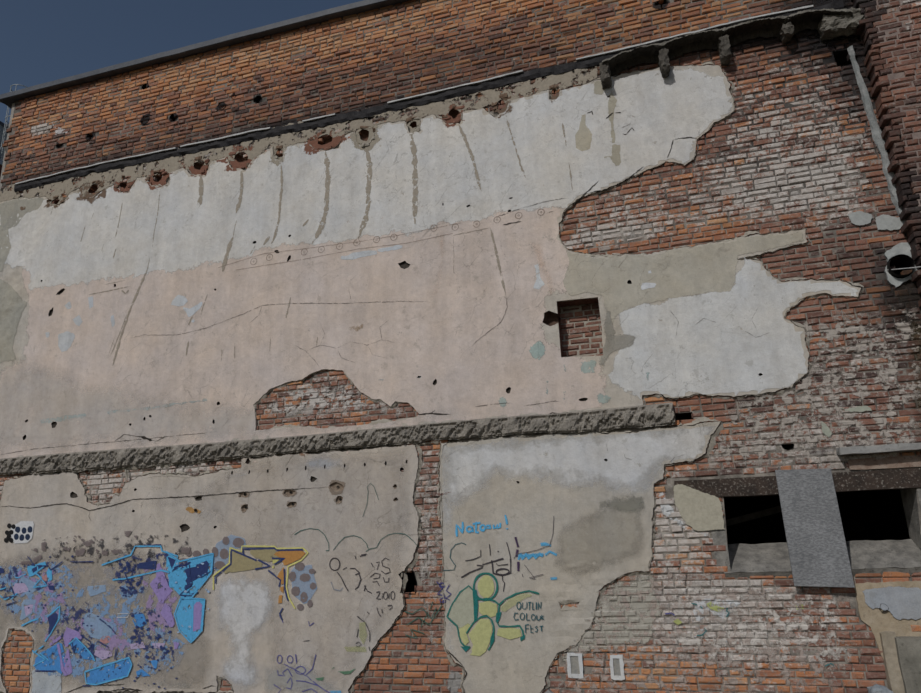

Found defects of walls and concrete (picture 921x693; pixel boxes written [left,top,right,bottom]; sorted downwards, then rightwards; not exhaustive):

damp [269,147,287,242]
flaking render [0,40,653,363]
damp [303,123,380,244]
damp [406,119,421,224]
damp [442,104,481,189]
damp [490,99,524,172]
flaking render [253,369,419,431]
flaking render [540,34,921,693]
flaking render [0,473,32,500]
flaking render [56,433,553,693]
flaking render [0,628,34,693]